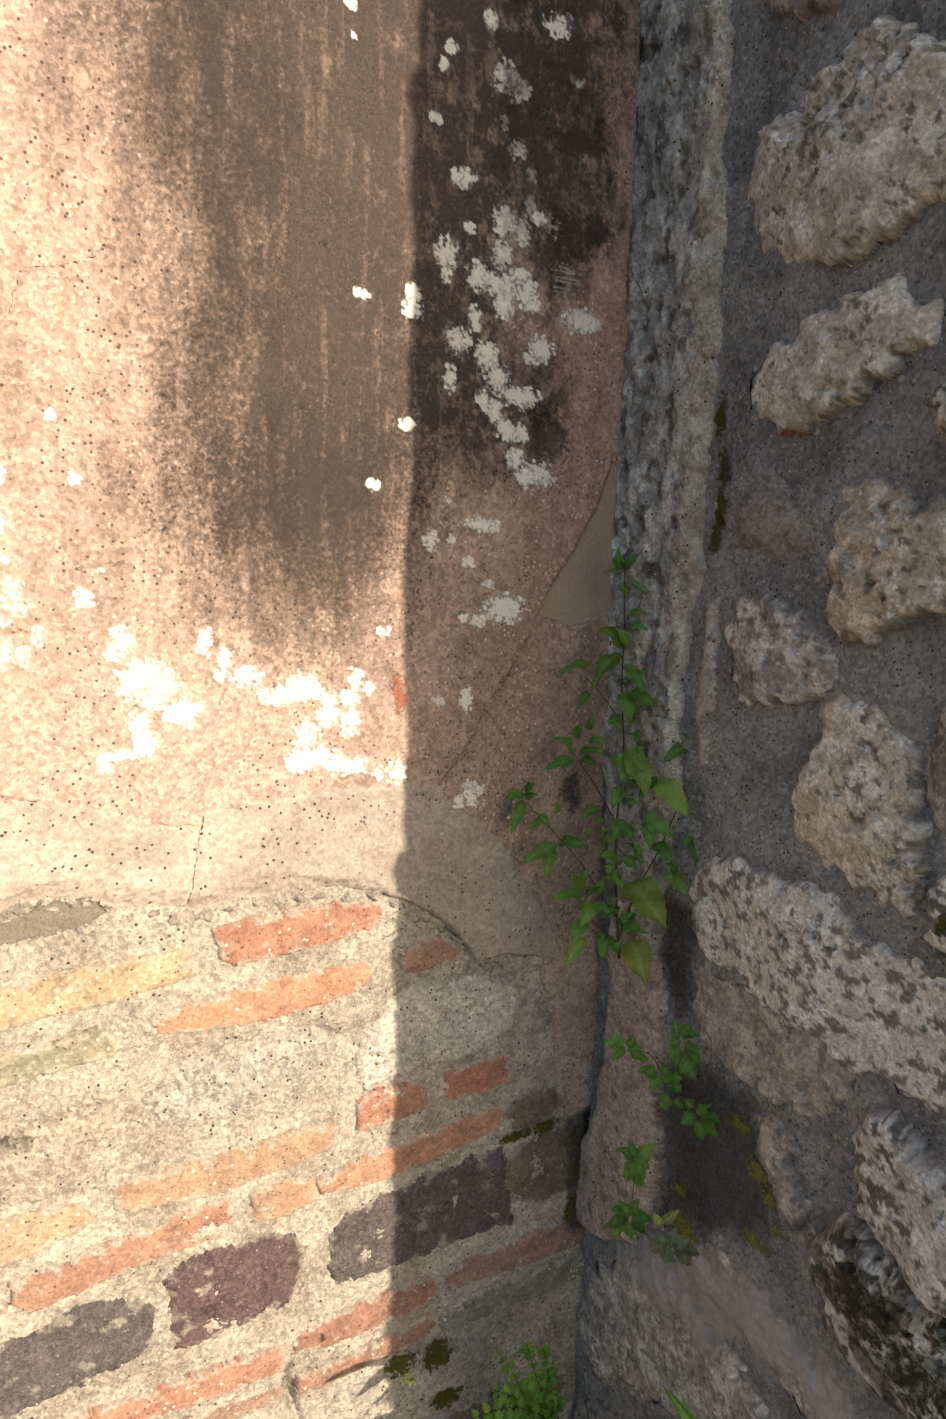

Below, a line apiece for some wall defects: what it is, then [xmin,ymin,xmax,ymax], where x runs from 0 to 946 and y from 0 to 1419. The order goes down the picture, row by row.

leakage [84,0,637,643]
leakage [96,623,205,775]
leakage [195,608,408,786]
leakage [430,687,473,716]
leakage [451,778,486,809]